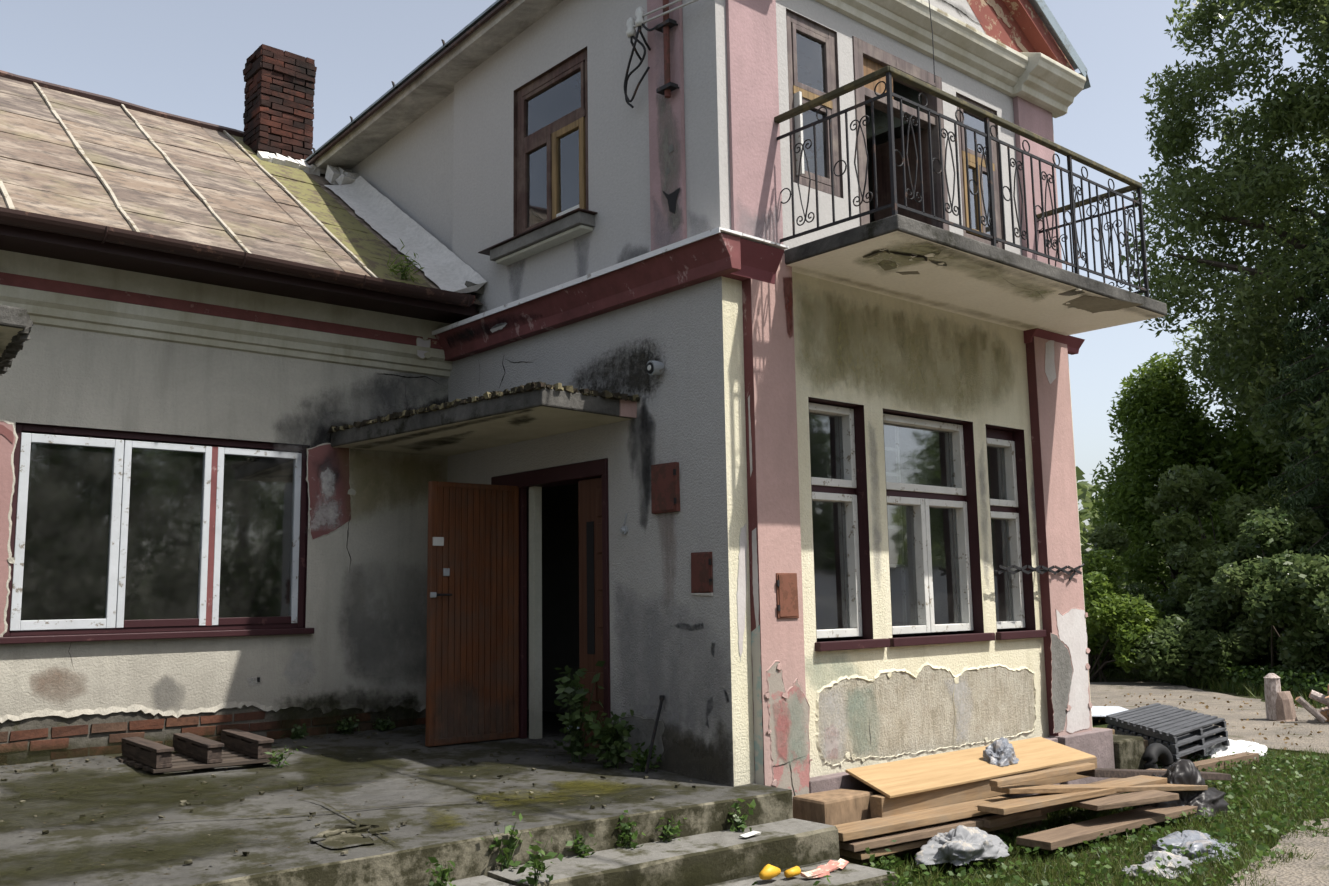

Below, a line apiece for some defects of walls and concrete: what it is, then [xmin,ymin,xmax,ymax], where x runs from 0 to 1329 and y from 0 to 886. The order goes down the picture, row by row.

peeling [862,249,947,275]
spalling [0,314,33,376]
water stain [590,352,651,433]
peeling [306,381,640,540]
peeling [0,419,18,636]
flaking render [736,523,1092,804]
flaking render [0,690,426,766]